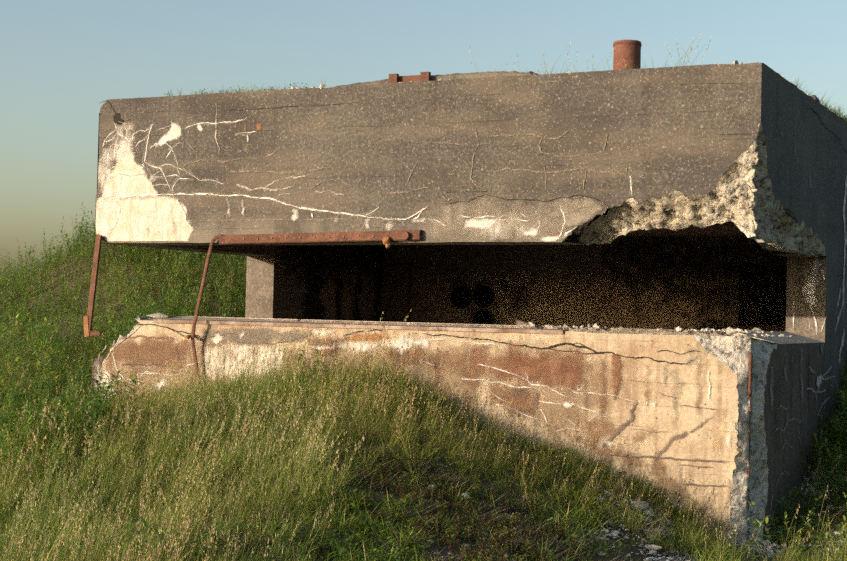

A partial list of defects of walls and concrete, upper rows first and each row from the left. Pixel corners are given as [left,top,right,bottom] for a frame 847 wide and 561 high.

peeling [99,128,157,200]
crack [99,100,632,242]
spalling [431,121,826,257]
corrosion [360,344,583,421]
crack [464,364,601,431]
crack [423,333,700,364]
corrosion [584,354,621,408]
spalling [693,335,777,549]
crack [776,364,835,448]